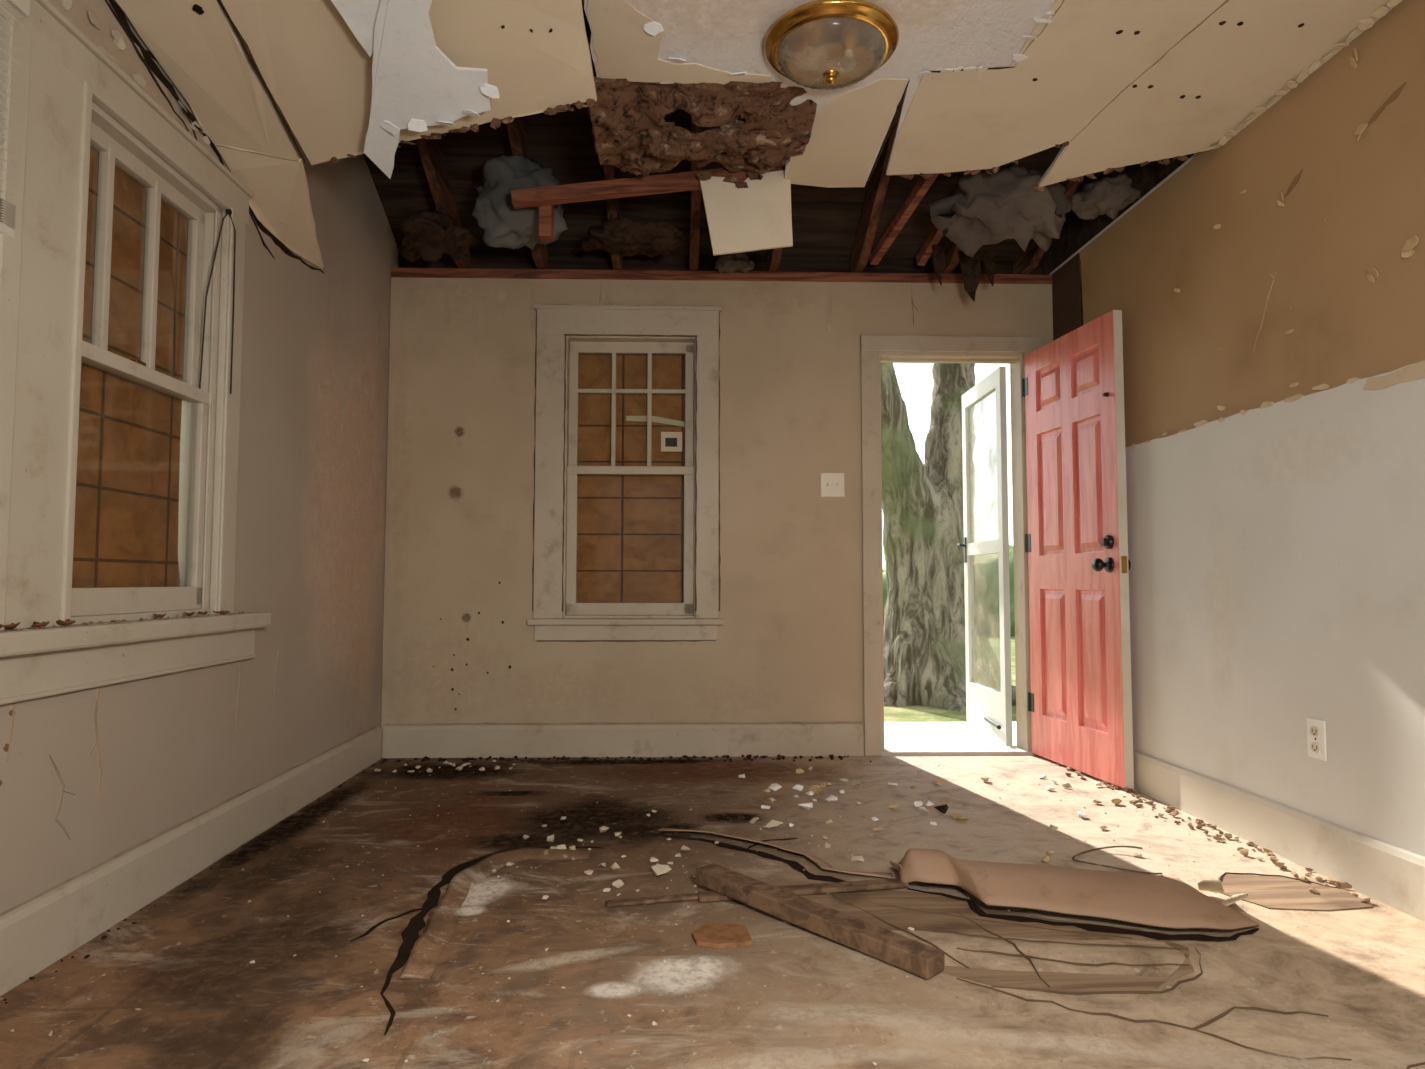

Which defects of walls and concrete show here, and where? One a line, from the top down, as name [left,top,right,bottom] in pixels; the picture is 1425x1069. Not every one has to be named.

peeling [787,0,1402,193]
water stain [393,759,795,850]
water stain [175,784,367,898]
water stain [458,879,511,916]
water stain [143,901,342,1002]
water stain [513,949,624,969]
water stain [591,957,721,997]
water stain [740,1049,926,1069]
water stain [779,1005,1356,1069]
crack [957,978,1352,1061]
crack [1407,1061,1425,1069]